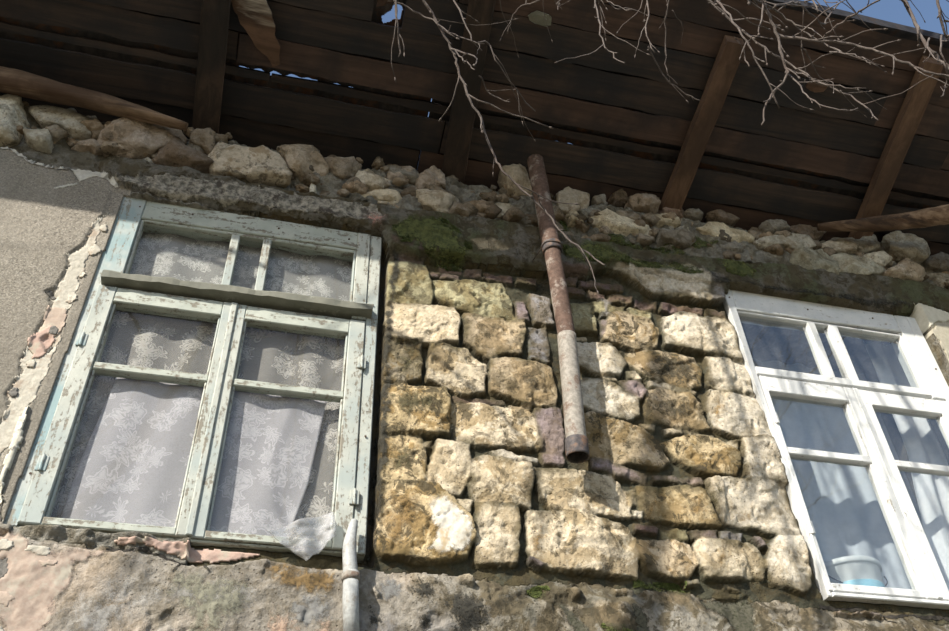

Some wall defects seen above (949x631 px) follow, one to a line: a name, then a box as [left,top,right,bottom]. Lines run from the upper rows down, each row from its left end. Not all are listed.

peeling [0,209,110,631]
spalling [114,536,260,564]